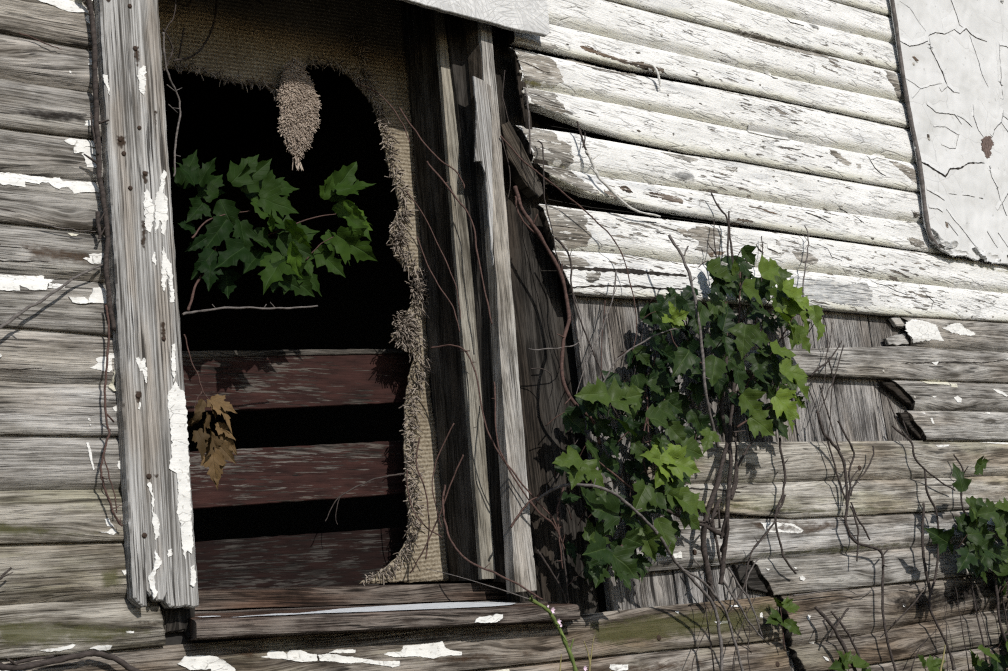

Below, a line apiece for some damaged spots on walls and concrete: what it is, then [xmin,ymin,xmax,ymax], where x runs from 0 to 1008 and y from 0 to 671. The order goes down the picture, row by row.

peeling [38,0,93,24]
peeling [733,28,829,58]
peeling [511,38,669,114]
crack [899,0,1008,251]
peeling [0,138,99,194]
peeling [517,126,692,204]
peeling [540,205,601,283]
peeling [0,274,106,304]
peeling [904,310,975,343]
peeling [147,344,196,599]
peeling [178,655,235,671]
peeling [263,641,462,668]